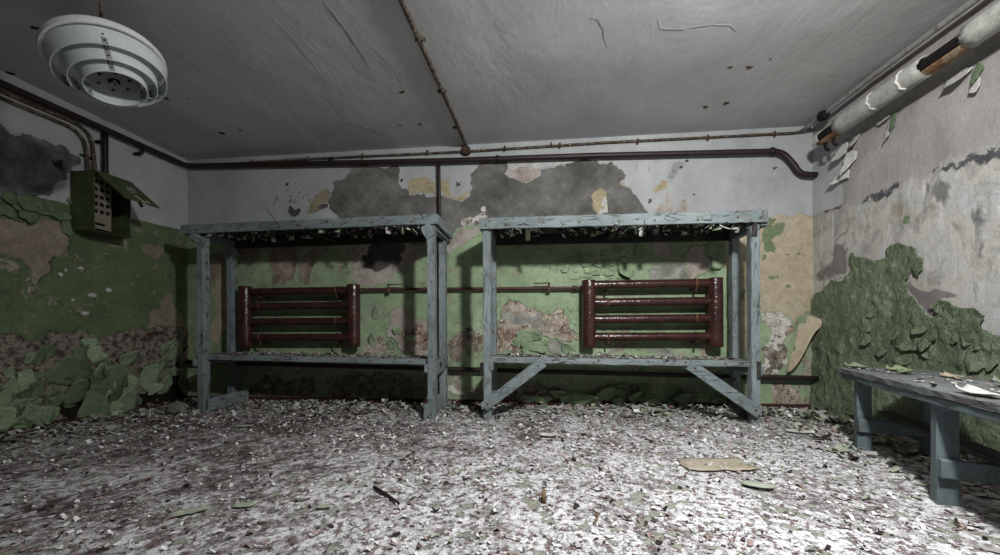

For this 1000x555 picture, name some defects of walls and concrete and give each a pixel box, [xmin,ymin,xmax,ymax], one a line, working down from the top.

flaking render [0,122,189,433]
peeling [200,159,1000,421]
peeling [959,412,1000,451]